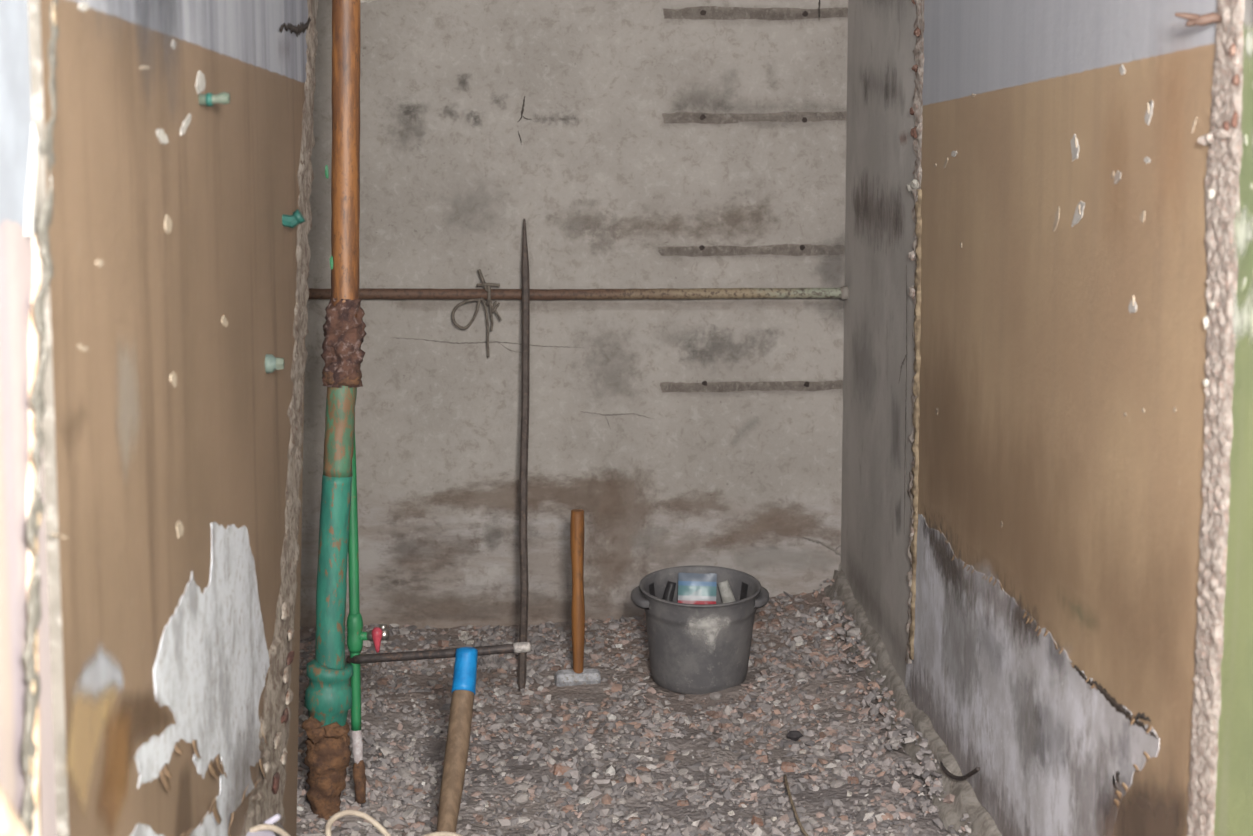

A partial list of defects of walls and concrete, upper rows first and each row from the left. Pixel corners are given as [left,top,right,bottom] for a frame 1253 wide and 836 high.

peeling [130,0,319,836]
leakage [405,478,651,589]
leakage [717,508,816,545]
peeling [904,0,1160,836]